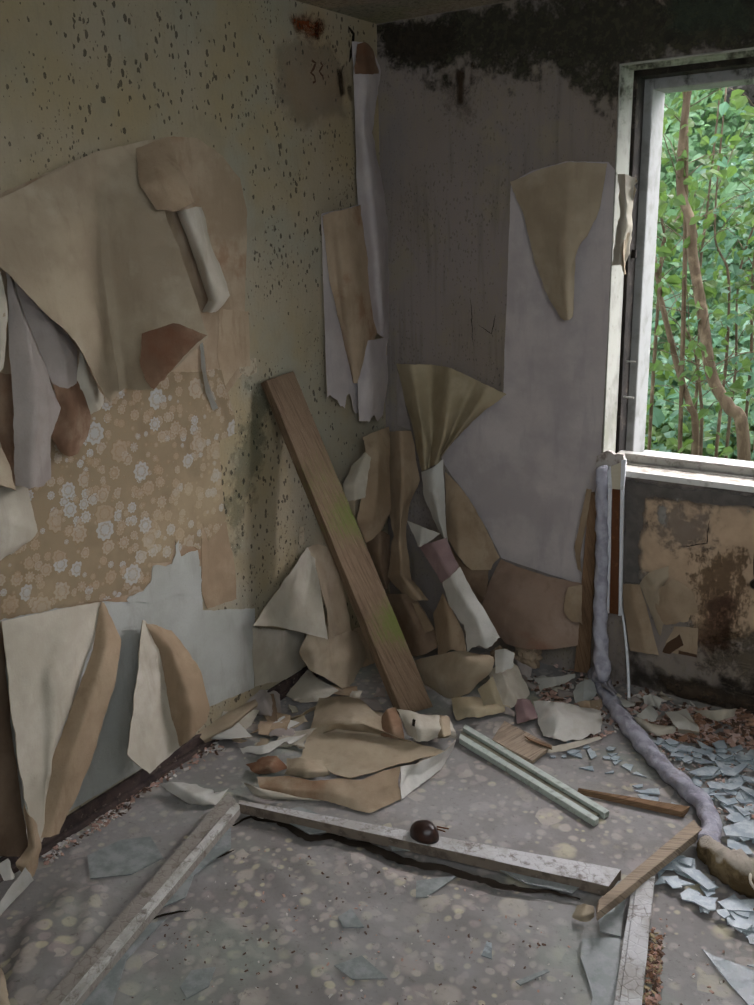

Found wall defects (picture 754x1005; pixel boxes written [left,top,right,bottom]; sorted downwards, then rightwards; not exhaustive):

mould [377,0,754,124]
leakage [619,479,754,715]